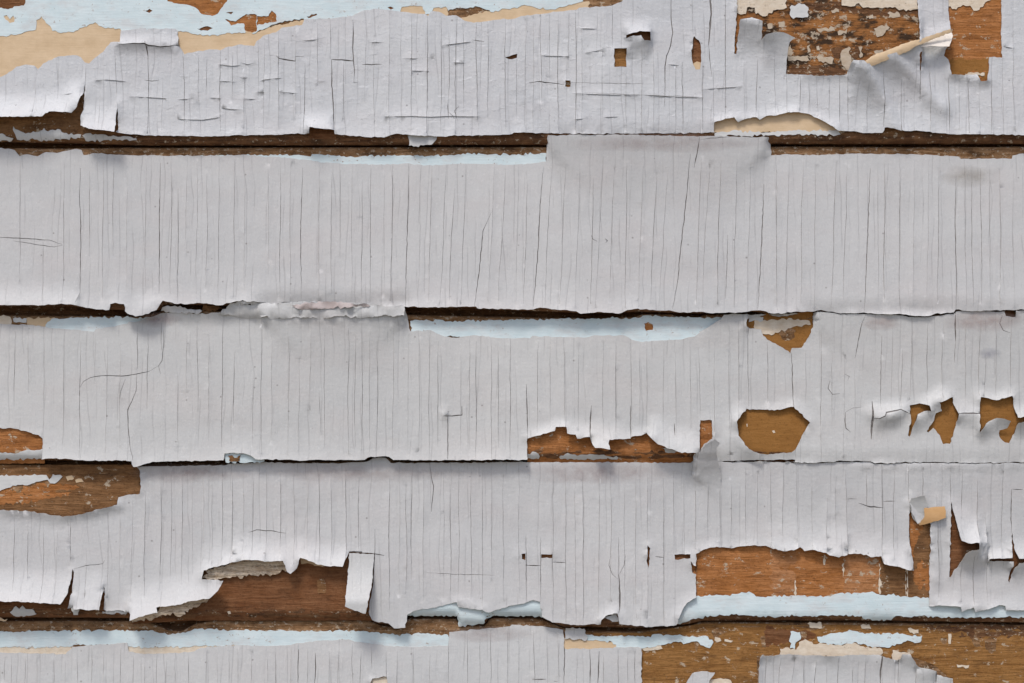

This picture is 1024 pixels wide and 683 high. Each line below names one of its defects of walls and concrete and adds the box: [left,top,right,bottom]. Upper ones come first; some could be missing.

peeling [0,0,590,77]
peeling [734,0,1002,81]
crack [127,0,803,307]
crack [0,169,104,300]
crack [63,327,235,458]
crack [222,333,708,616]
peeling [410,315,721,342]
peeling [737,407,810,462]
crack [835,479,910,547]
crack [820,177,1001,438]
peeling [0,552,449,654]
peeling [564,495,1024,683]